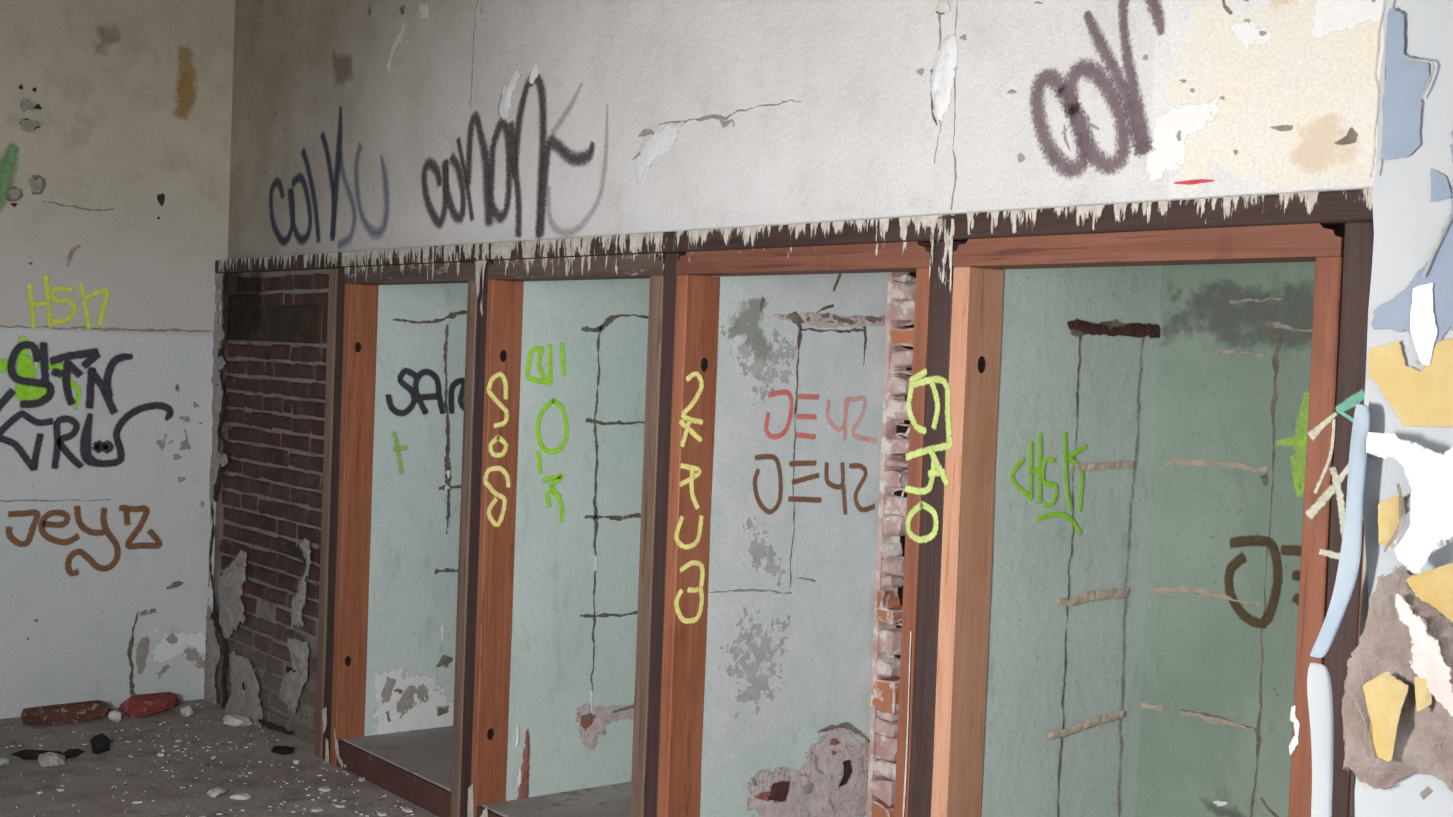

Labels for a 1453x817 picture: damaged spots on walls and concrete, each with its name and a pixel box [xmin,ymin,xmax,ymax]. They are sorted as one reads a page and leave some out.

crack [659,99,801,128]
peeling [967,0,1435,234]
flaking render [136,0,967,735]
peeling [701,272,889,817]
flaking render [1289,131,1453,817]
peeling [322,707,346,768]
peeling [467,783,488,817]
flaking render [516,722,530,799]
flaking render [576,703,634,750]
peeling [903,631,911,817]